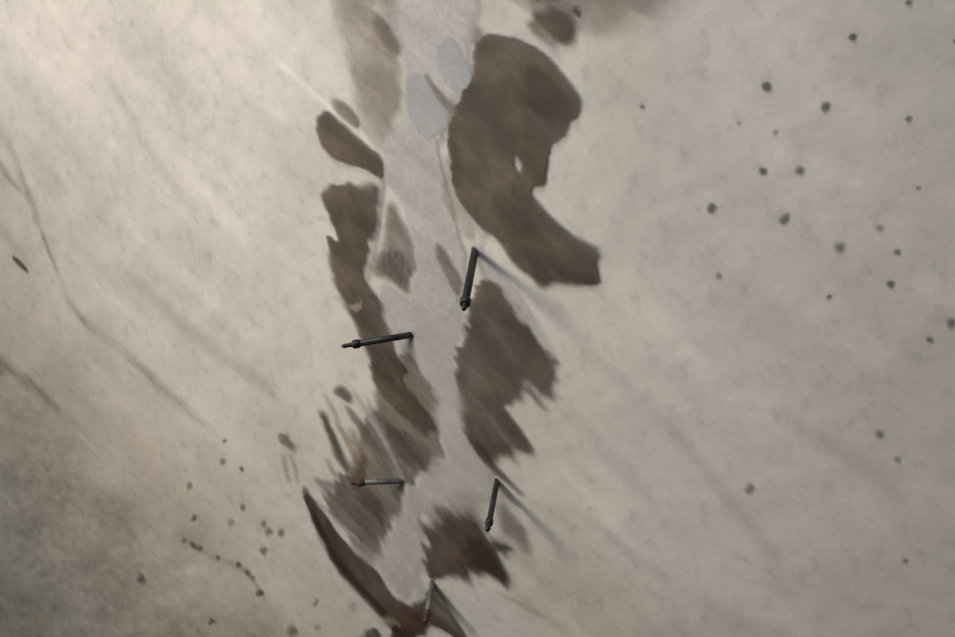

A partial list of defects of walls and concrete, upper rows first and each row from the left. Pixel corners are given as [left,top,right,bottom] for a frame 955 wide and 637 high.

damp [303,0,598,637]